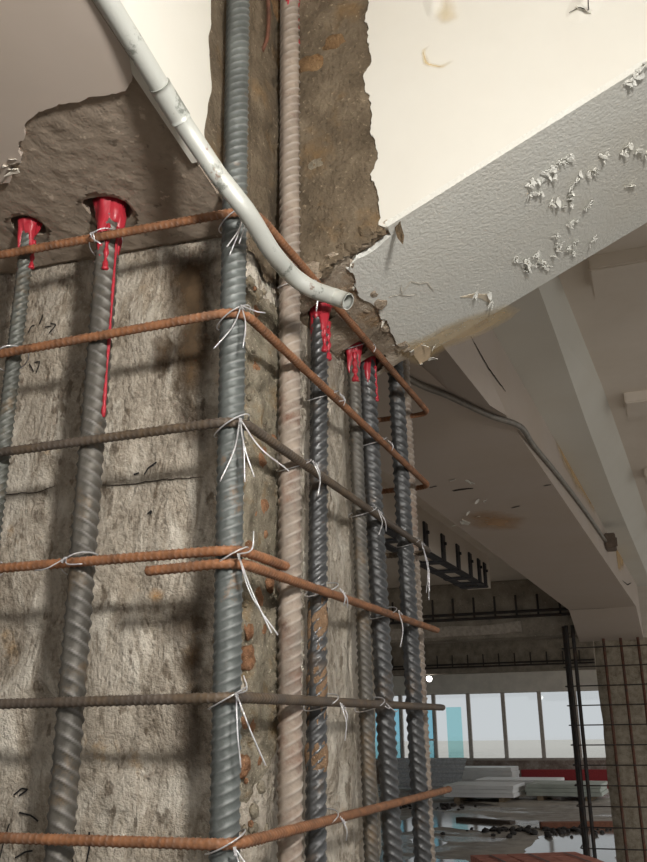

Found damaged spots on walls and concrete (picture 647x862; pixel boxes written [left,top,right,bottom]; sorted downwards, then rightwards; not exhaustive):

peeling [623,61,647,88]
peeling [620,143,647,160]
peeling [513,151,609,274]
spalling [0,0,437,862]
crack [107,477,198,486]